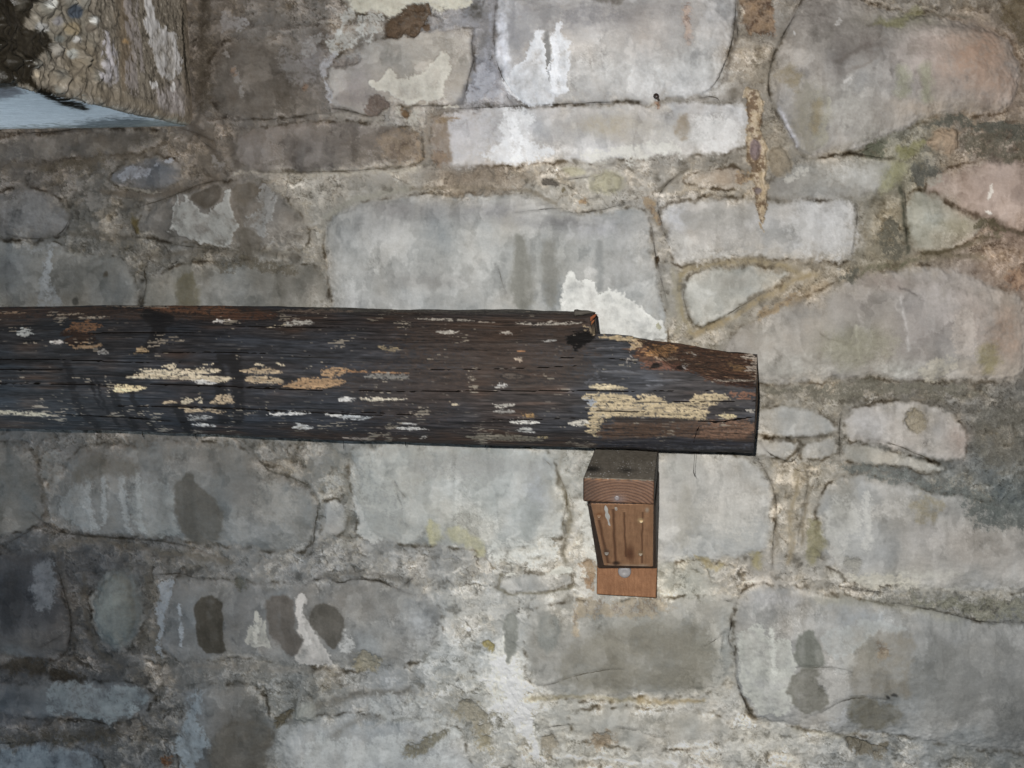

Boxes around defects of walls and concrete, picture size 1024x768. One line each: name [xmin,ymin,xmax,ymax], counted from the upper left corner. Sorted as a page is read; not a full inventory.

damp [506,1,568,83]
peeling [558,269,668,342]
damp [35,444,226,547]
damp [534,305,1024,766]
damp [244,592,356,669]